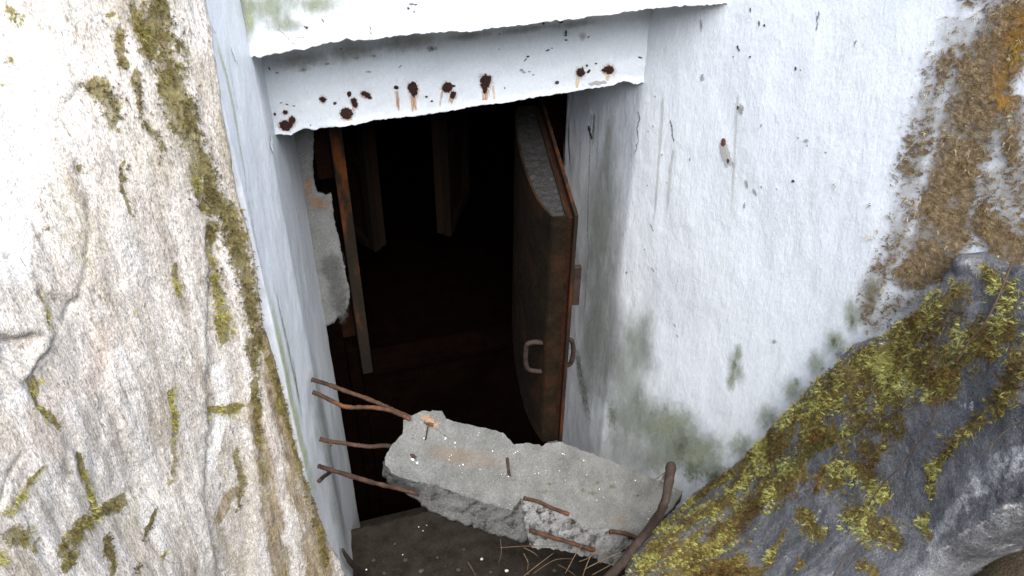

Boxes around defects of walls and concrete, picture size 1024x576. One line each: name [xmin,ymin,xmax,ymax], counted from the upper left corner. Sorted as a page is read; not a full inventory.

rust [319,91,372,121]
rust [394,81,456,111]
rust [480,74,495,100]
rust [576,63,614,88]
leakage [592,179,612,262]
spalling [311,377,412,421]
leakage [587,296,709,468]
spalling [317,437,637,566]